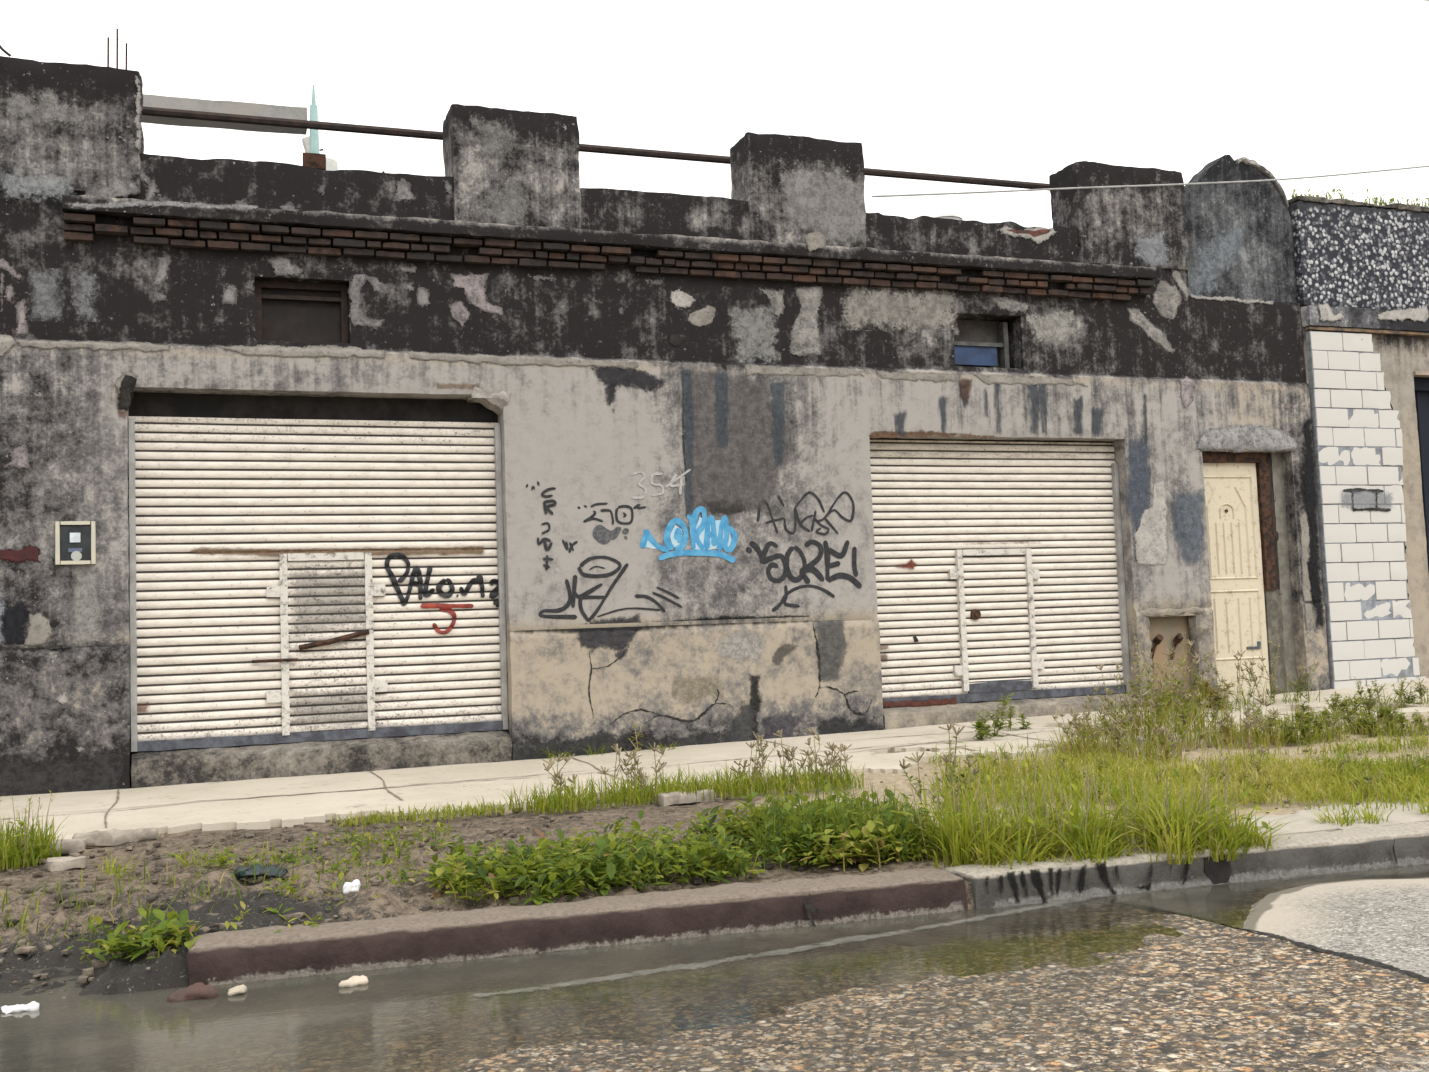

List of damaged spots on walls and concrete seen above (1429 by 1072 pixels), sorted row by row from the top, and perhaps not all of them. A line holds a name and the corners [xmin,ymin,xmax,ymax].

peeling [268,256,303,277]
peeling [348,264,430,329]
peeling [449,273,503,326]
peeling [638,279,696,309]
peeling [221,344,386,359]
peeling [407,350,639,370]
spalling [466,386,509,416]
damp [592,366,664,412]
damp [682,370,790,515]
peeling [1134,480,1169,566]
crack [588,652,734,724]
crack [813,625,872,715]